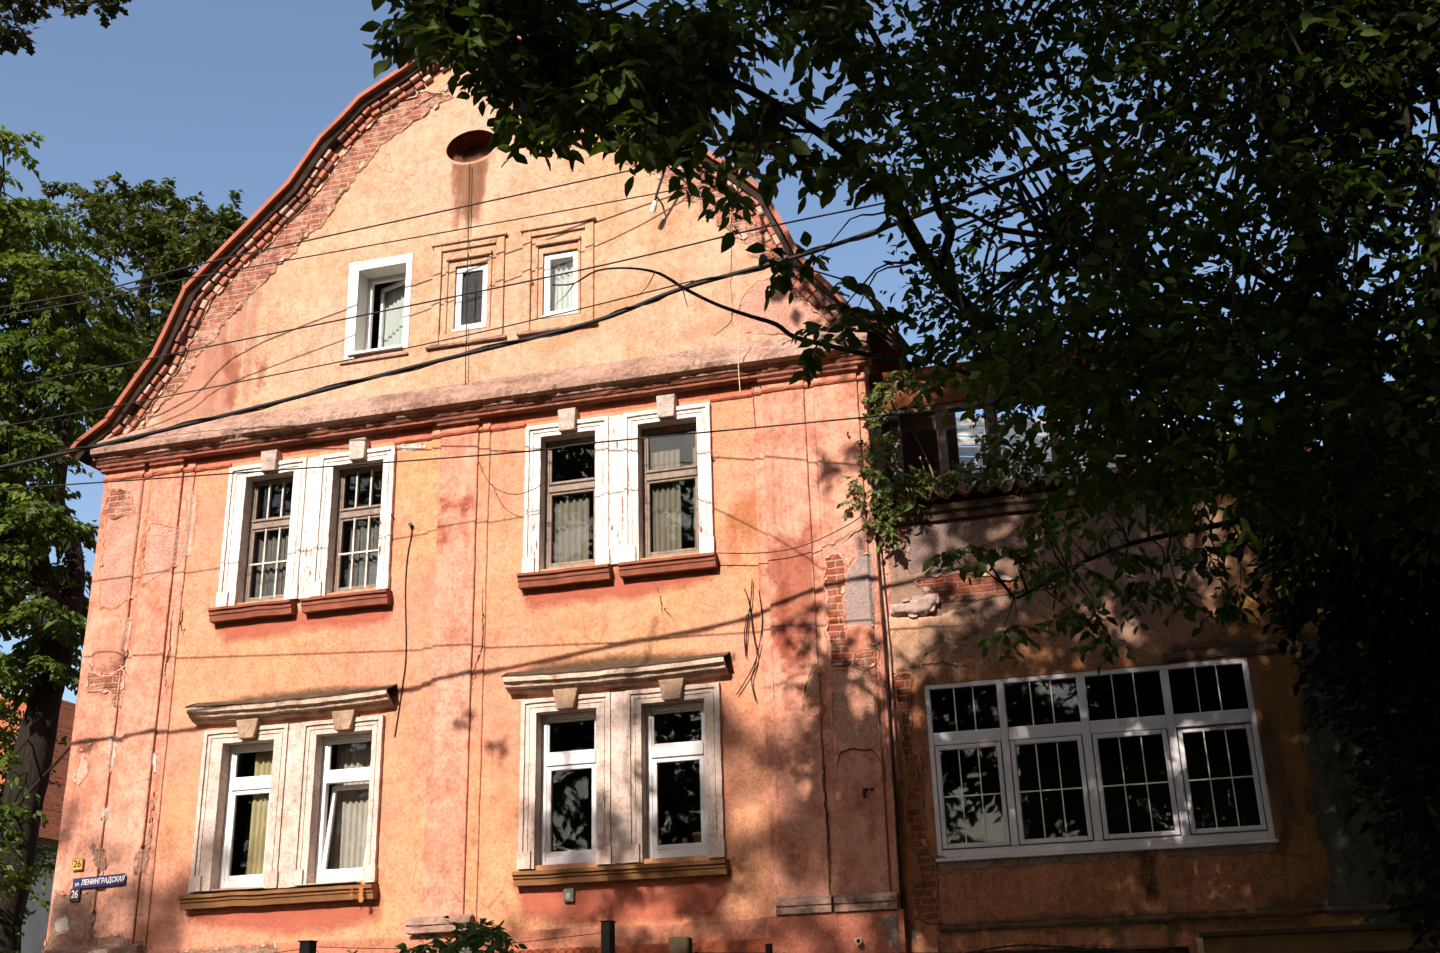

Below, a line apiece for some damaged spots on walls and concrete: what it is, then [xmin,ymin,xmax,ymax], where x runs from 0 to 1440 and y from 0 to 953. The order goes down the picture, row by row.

spalling [131,71,470,431]
damp [455,159,484,220]
flaking render [85,472,199,708]
flaking render [800,523,1069,940]